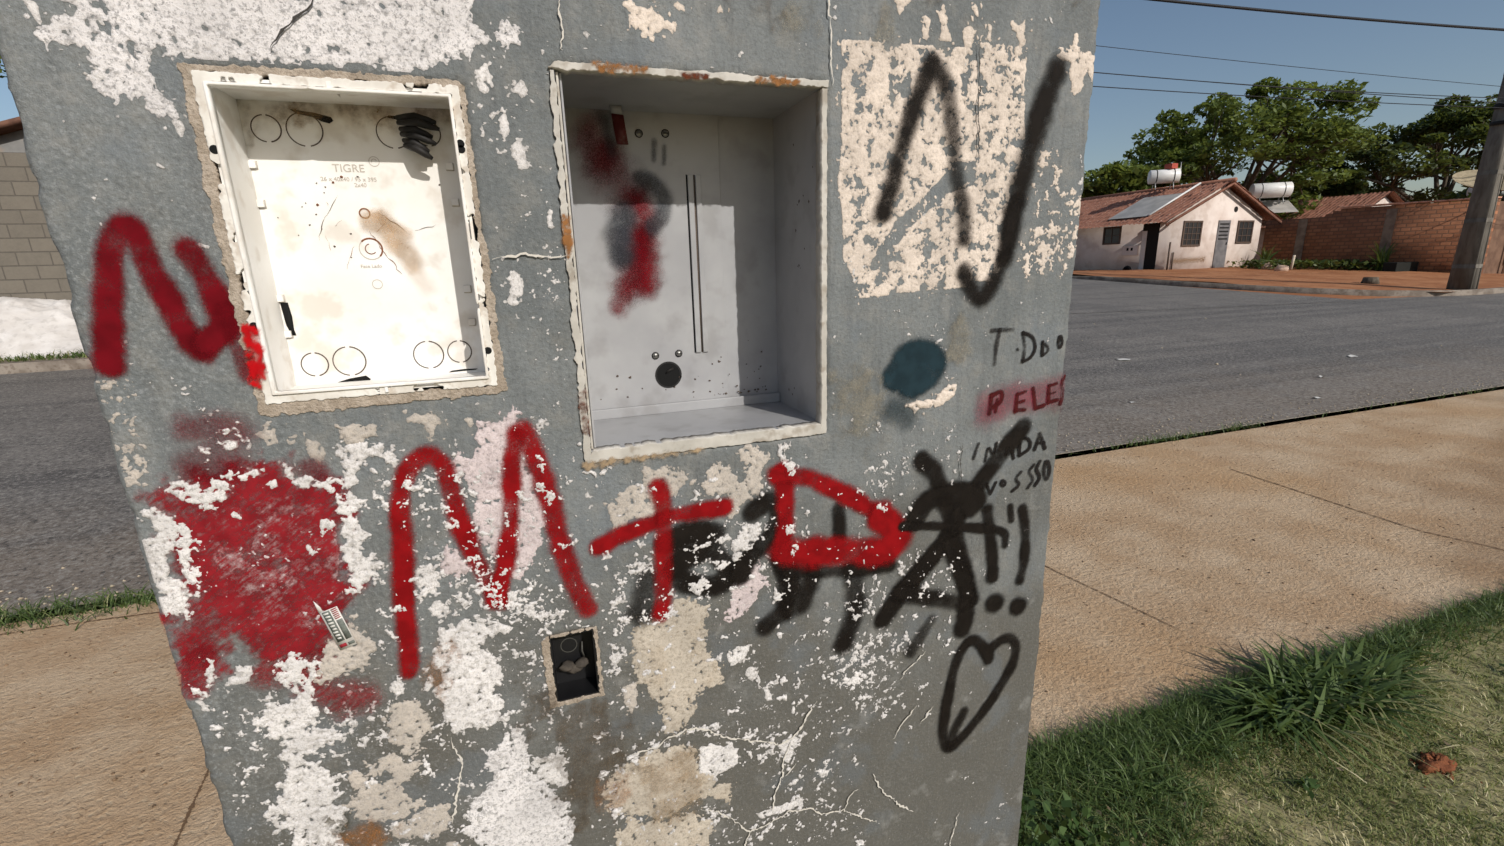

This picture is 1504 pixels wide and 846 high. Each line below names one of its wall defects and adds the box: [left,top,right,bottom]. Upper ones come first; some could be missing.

crack [270,0,313,52]
peeling [1057,33,1095,96]
peeling [9,0,568,380]